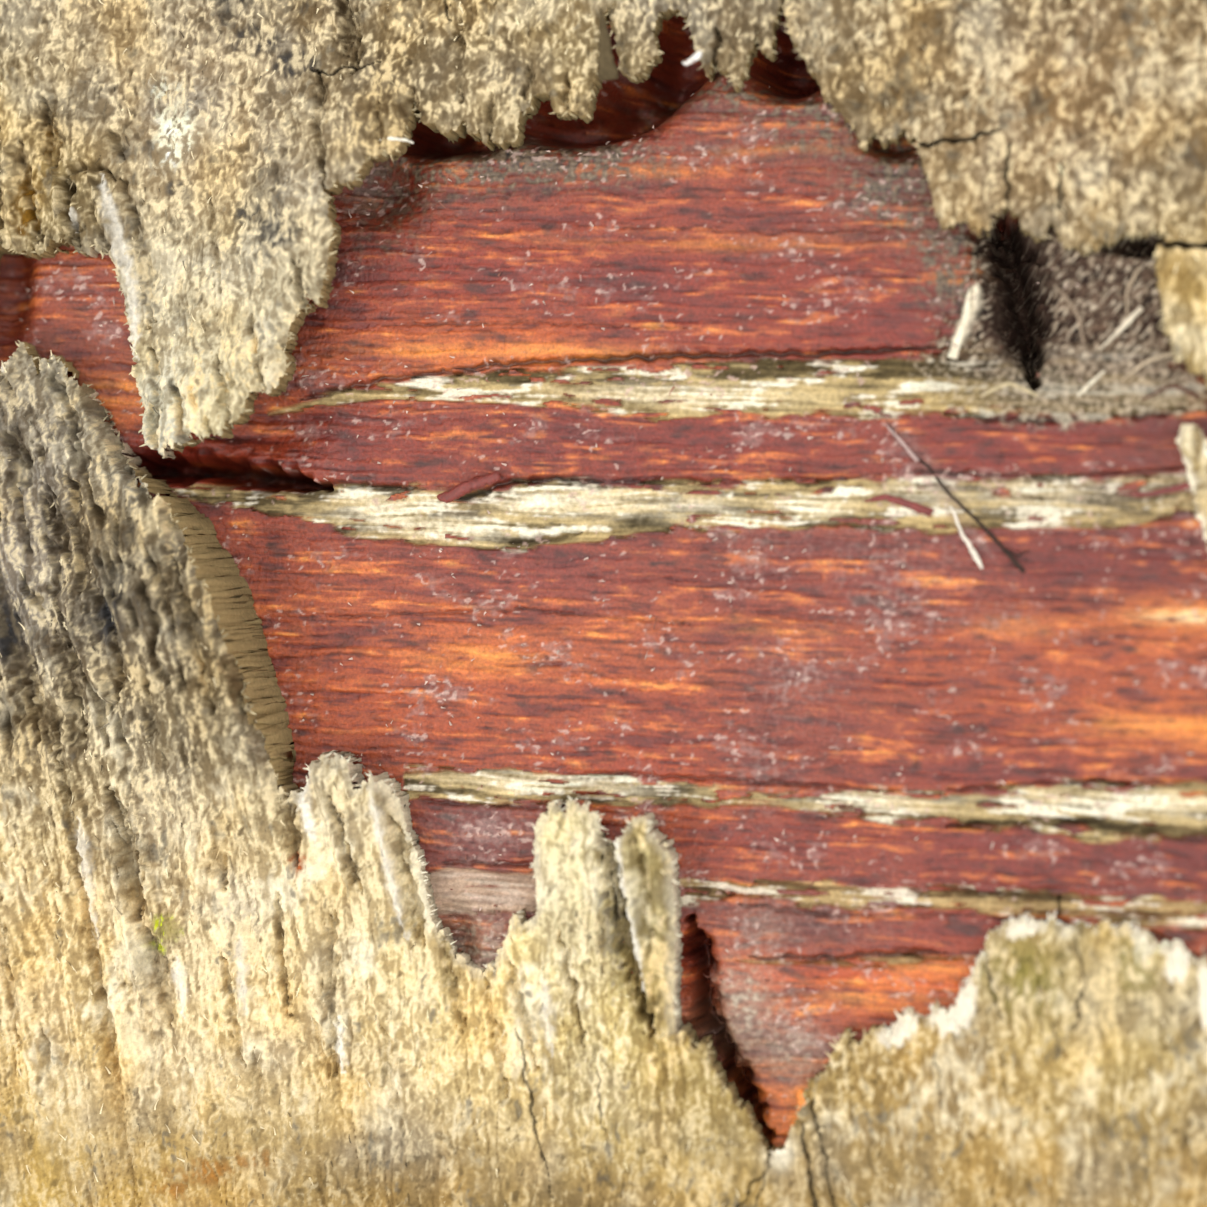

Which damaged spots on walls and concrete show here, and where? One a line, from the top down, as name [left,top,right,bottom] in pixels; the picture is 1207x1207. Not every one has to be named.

peeling [0,14,1207,553]
crack [919,128,1001,147]
crack [1162,241,1207,249]
peeling [189,474,1207,1151]